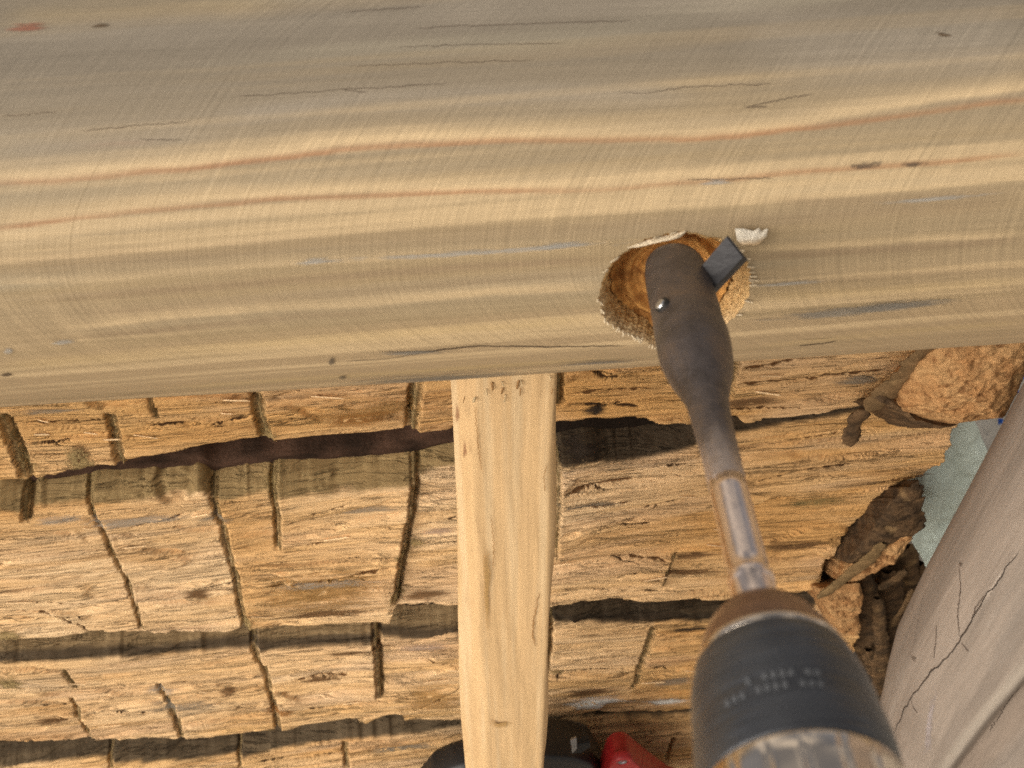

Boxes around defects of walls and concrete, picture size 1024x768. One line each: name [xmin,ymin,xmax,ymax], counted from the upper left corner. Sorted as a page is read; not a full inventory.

crack [895,555,1017,730]